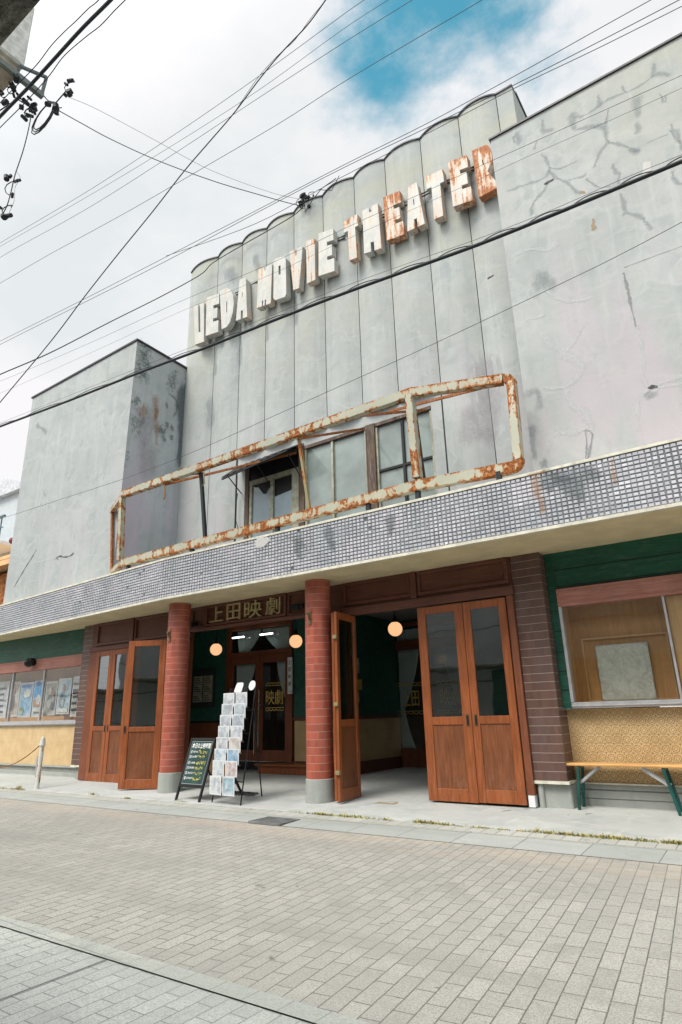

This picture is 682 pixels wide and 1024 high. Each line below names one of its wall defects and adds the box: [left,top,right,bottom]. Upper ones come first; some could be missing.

damp [174,382,186,466]